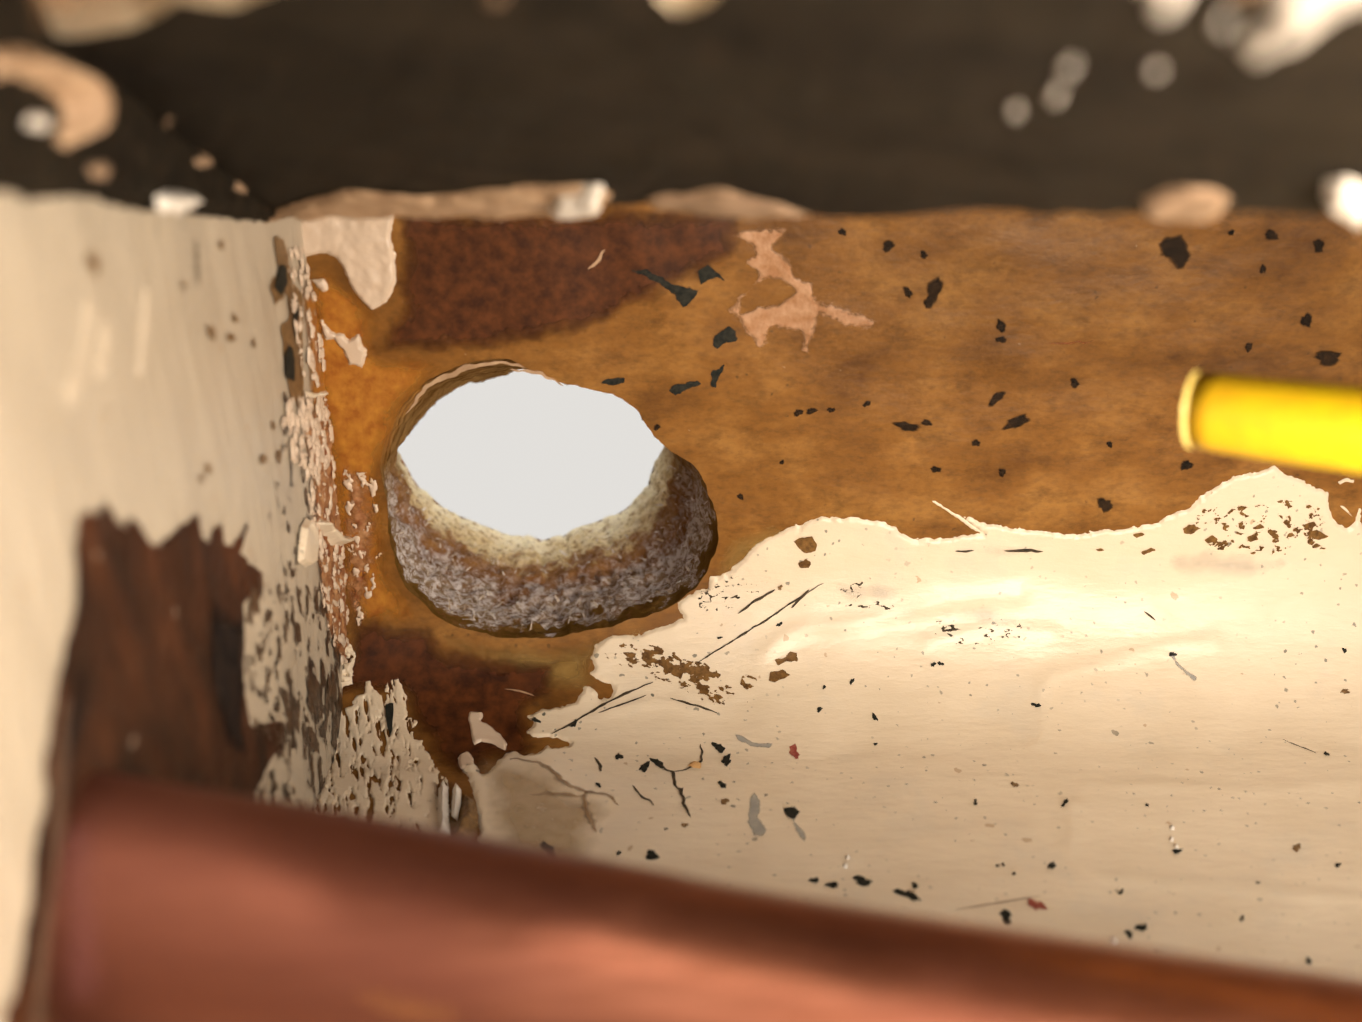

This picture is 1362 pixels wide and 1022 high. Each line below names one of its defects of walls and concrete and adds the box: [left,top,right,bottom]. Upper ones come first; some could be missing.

peeling [550,184,604,220]
peeling [1141,186,1232,269]
peeling [1322,178,1362,229]
damp [391,212,736,349]
spalling [632,265,726,307]
peeling [320,319,367,368]
rust [282,392,382,666]
damp [304,278,618,851]
spalling [794,536,817,568]
spalling [1183,500,1328,555]
spalling [605,643,798,705]
peeling [5,425,507,1022]